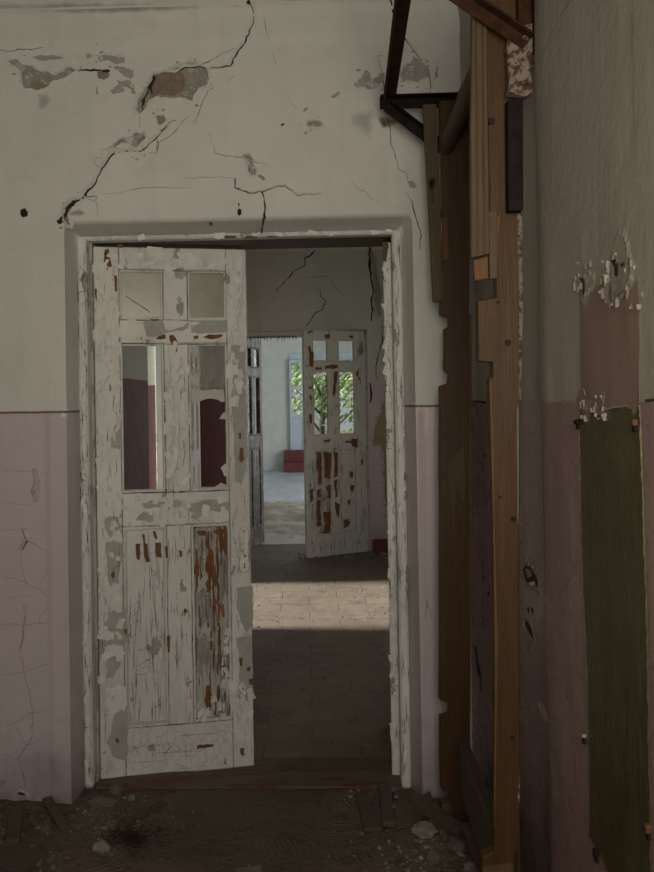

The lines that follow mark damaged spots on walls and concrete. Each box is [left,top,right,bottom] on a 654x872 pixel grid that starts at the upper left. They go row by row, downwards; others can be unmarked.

flaking render [5,43,217,135]
crack [54,0,322,233]
crack [405,34,437,93]
peeling [251,229,337,237]
crack [276,250,336,325]
peeling [308,346,338,396]
crack [306,114,422,554]
flaking render [573,253,645,422]
crack [77,249,252,782]
peeling [310,439,363,533]
peeling [370,229,410,767]
crack [0,528,51,788]